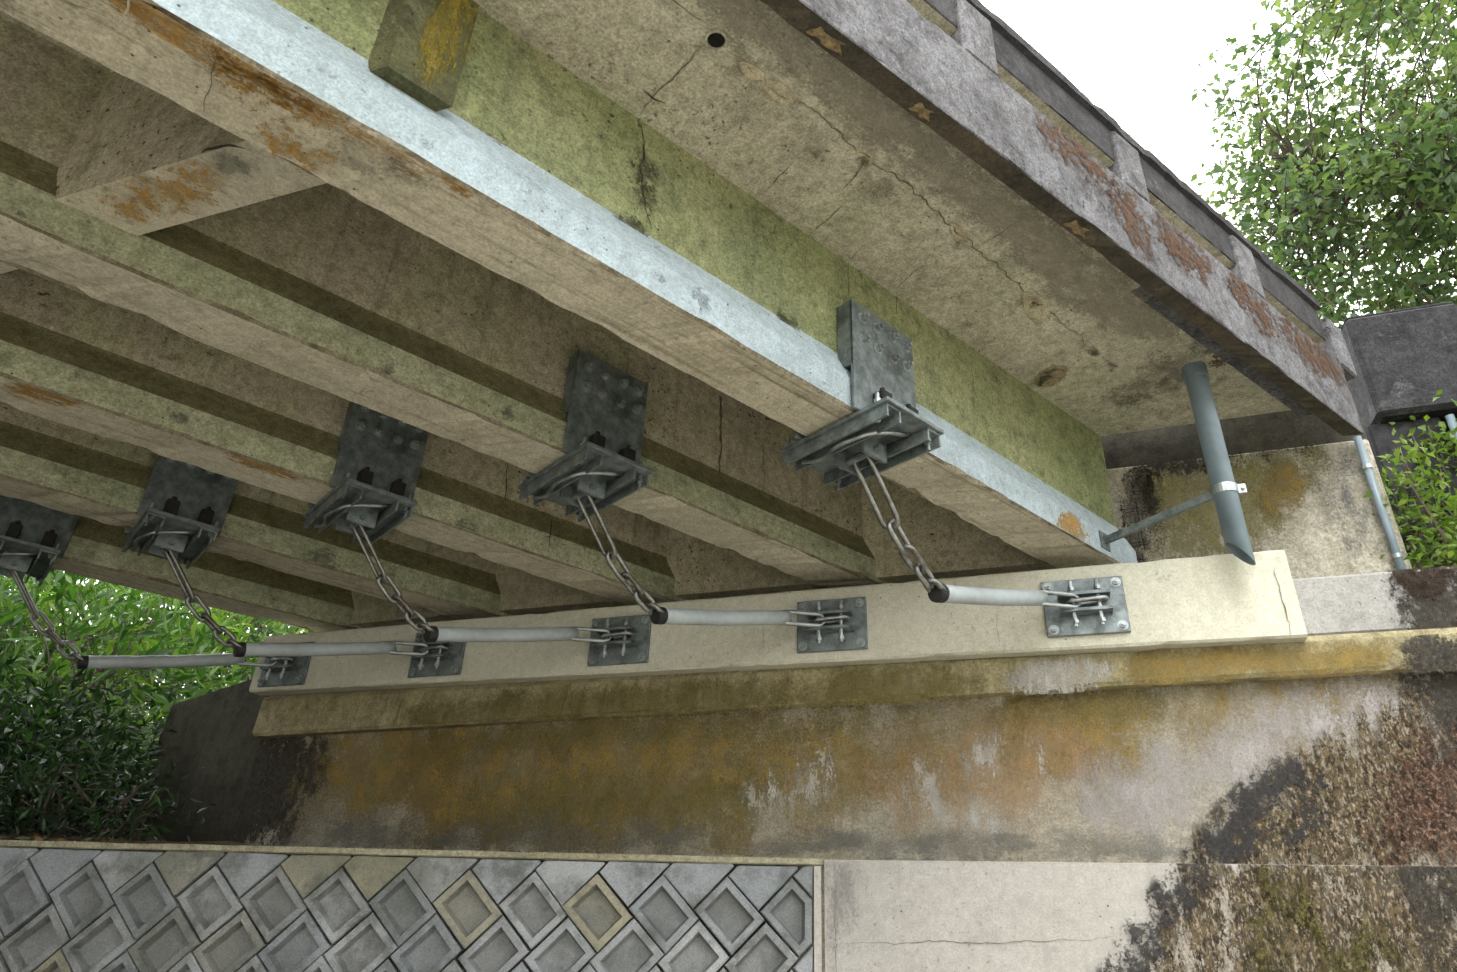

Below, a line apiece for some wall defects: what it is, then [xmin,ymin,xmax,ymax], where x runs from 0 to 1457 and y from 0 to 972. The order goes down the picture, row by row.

crack [64,0,130,23]
rust [106,0,473,198]
rust [96,144,250,223]
rust [1054,511,1090,544]
water stain [269,642,1424,927]